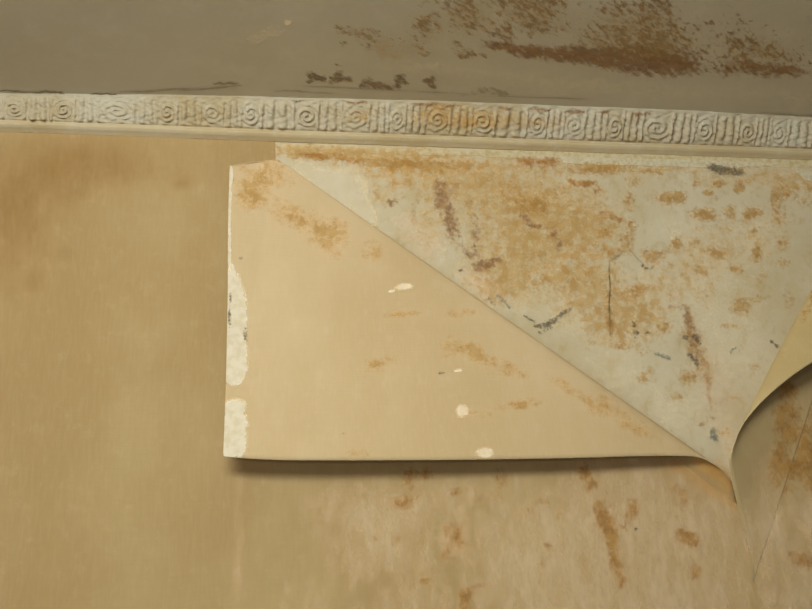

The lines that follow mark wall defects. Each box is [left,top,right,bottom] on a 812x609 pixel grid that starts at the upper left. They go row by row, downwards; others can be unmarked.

mould [444,0,804,76]
mould [306,64,409,90]
flaking render [297,163,375,223]
water stain [660,192,685,203]
water stain [704,164,750,195]
water stain [420,156,668,348]
water stain [584,489,723,609]